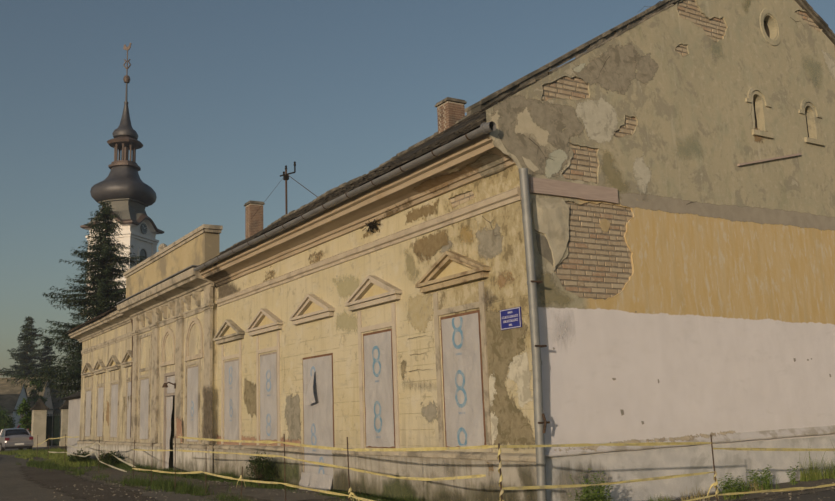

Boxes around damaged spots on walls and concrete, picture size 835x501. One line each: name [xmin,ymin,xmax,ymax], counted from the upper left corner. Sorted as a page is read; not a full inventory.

flaking render [673,0,728,43]
peeling [470,43,658,195]
flaking render [536,199,635,302]
peeling [244,379,257,417]
peeling [285,394,301,441]
peeling [421,401,438,422]
peeling [483,309,535,450]